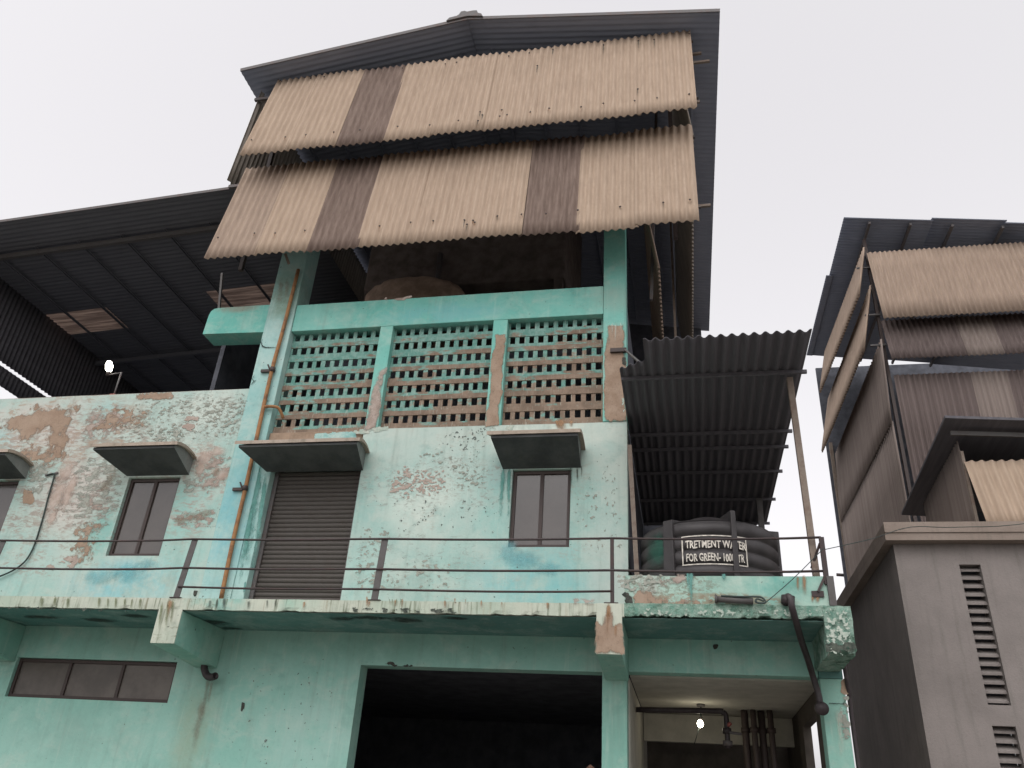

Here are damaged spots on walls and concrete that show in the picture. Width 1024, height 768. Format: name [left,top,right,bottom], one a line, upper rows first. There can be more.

peeling [314,368,388,439]
peeling [603,325,626,422]
peeling [0,392,246,568]
peeling [358,334,514,558]
damp [86,598,145,622]
peeling [595,613,625,654]
peeling [617,574,790,617]
spalling [803,608,857,656]